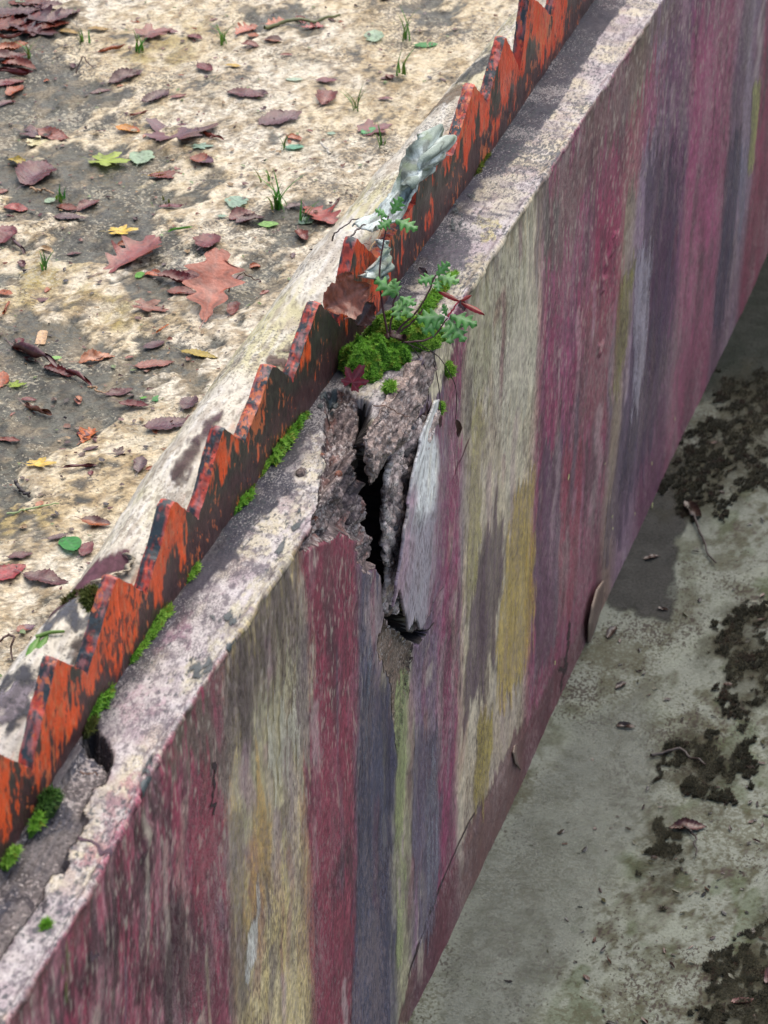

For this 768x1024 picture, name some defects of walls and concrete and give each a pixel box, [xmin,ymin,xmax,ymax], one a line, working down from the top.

flaking render [273,388,456,631]
crack [351,403,387,585]
spalling [0,731,113,960]
peeling [140,753,154,798]
crack [377,607,435,760]
rust [474,464,536,805]